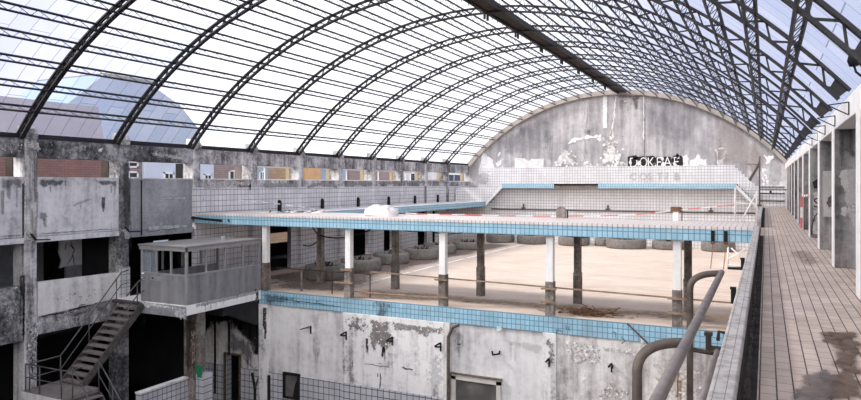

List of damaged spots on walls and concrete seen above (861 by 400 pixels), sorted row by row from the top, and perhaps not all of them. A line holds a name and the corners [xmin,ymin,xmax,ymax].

peeling [515,95,625,168]
peeling [683,147,726,166]
leakage [184,243,507,400]
peeling [345,317,443,350]
peeling [566,337,645,383]
leakage [794,332,861,400]